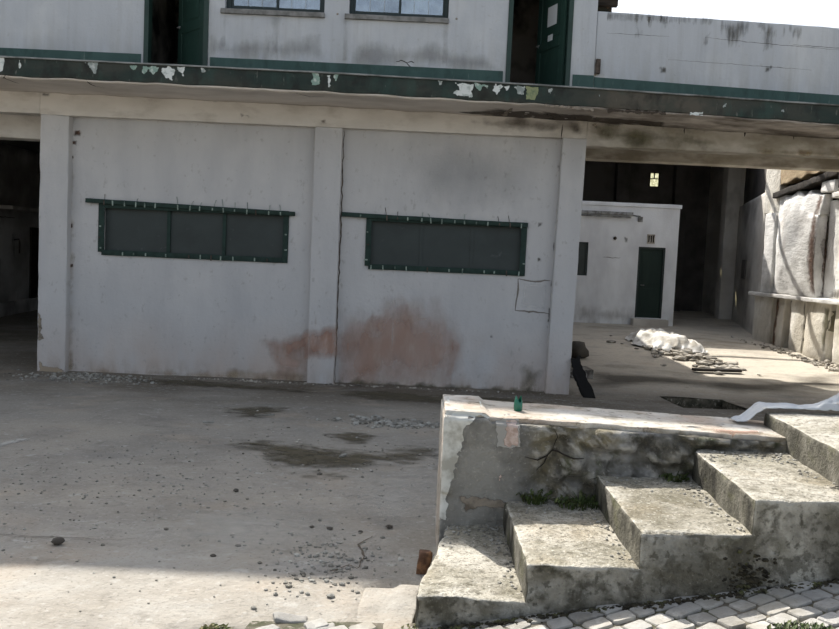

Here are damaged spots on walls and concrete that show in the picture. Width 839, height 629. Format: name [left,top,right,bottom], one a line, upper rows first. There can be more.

peeling [130,65,185,80]
peeling [454,82,538,100]
spalling [544,104,594,112]
damp [461,110,662,145]
corrosion [808,193,831,291]
damp [241,433,433,477]
crack [526,431,584,468]